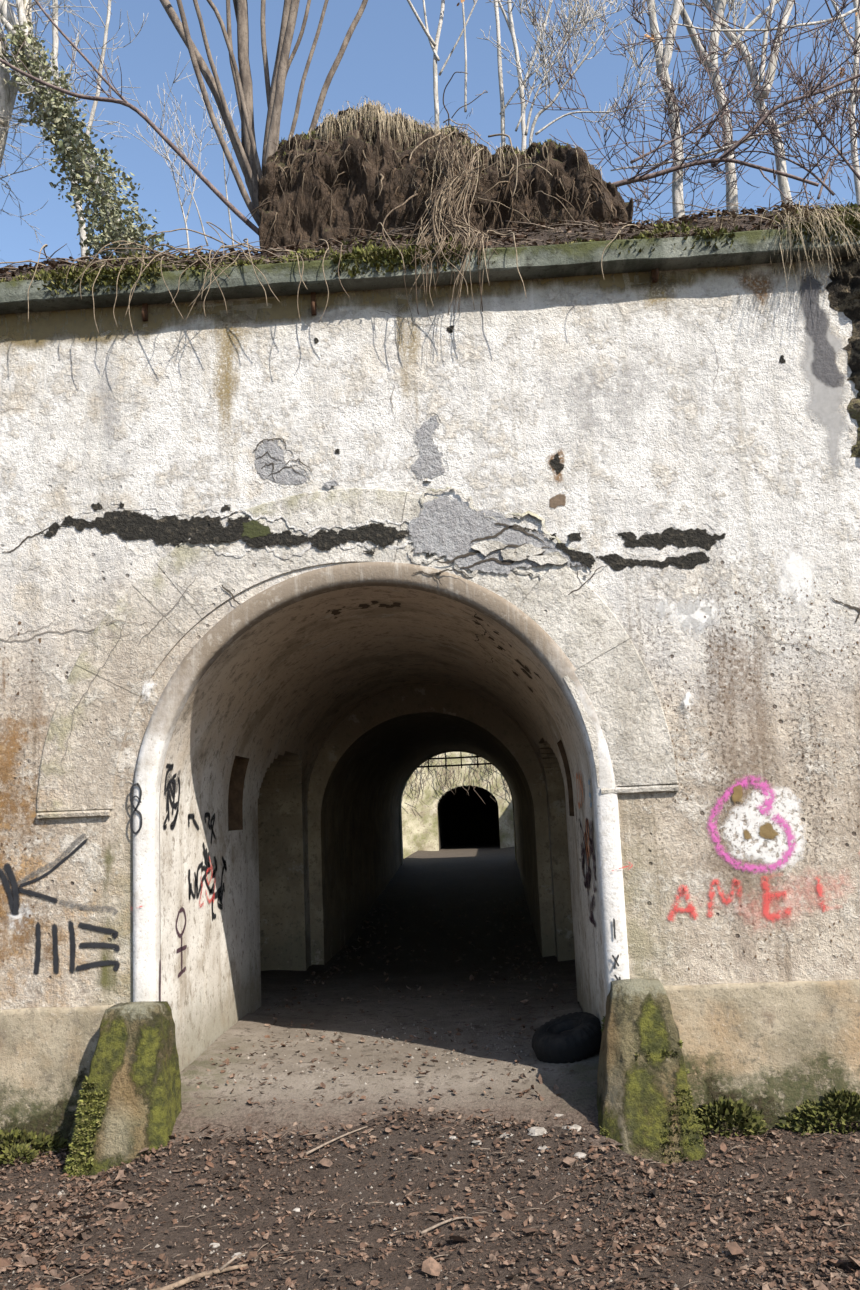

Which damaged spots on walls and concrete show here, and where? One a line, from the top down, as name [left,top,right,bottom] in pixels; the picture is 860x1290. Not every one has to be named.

leakage [0,265,772,403]
crack [0,577,240,779]
spalling [2,410,860,861]
crack [728,612,849,683]
crack [831,597,860,623]
corrosion [0,718,37,823]
corrosion [0,884,34,958]